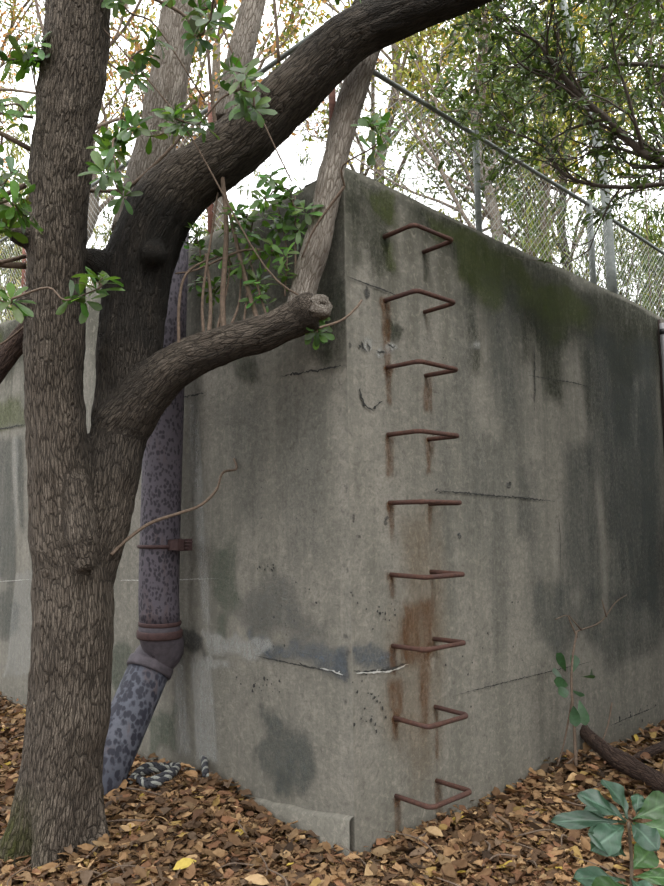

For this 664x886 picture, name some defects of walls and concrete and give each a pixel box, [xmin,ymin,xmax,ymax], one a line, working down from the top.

crack [279,365,341,377]
crack [359,341,395,353]
leakage [418,208,663,658]
crack [435,489,561,570]
leakage [151,630,408,759]
crack [259,656,408,678]